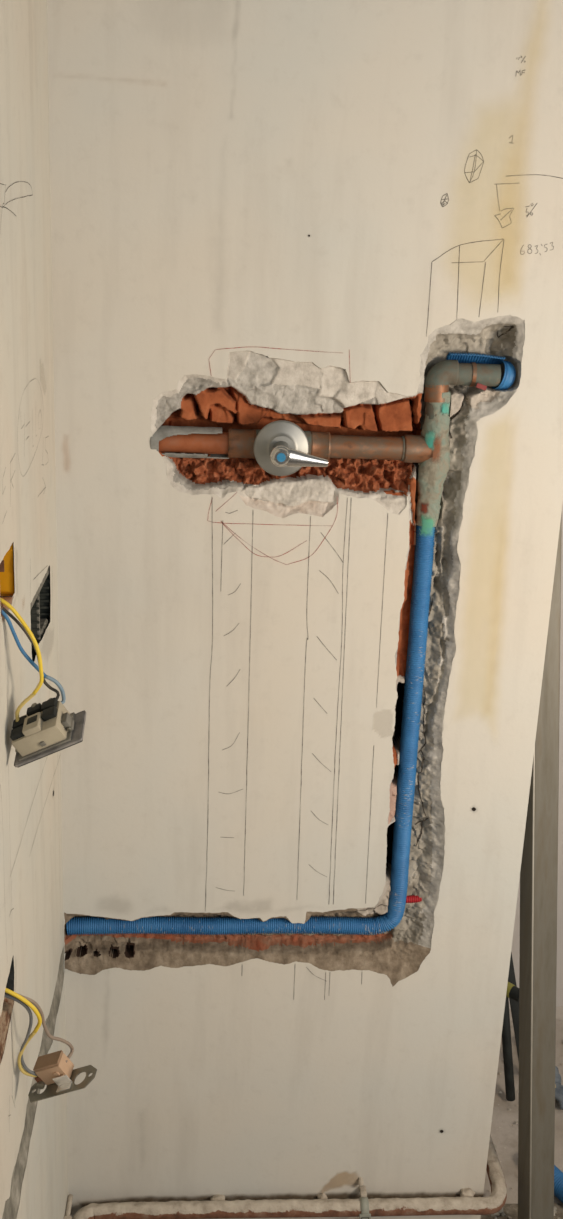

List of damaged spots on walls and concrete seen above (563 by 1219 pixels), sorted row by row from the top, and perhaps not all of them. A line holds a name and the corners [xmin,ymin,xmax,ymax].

spalling [150,315,525,437]
spalling [159,451,414,518]
spalling [5,957,14,996]